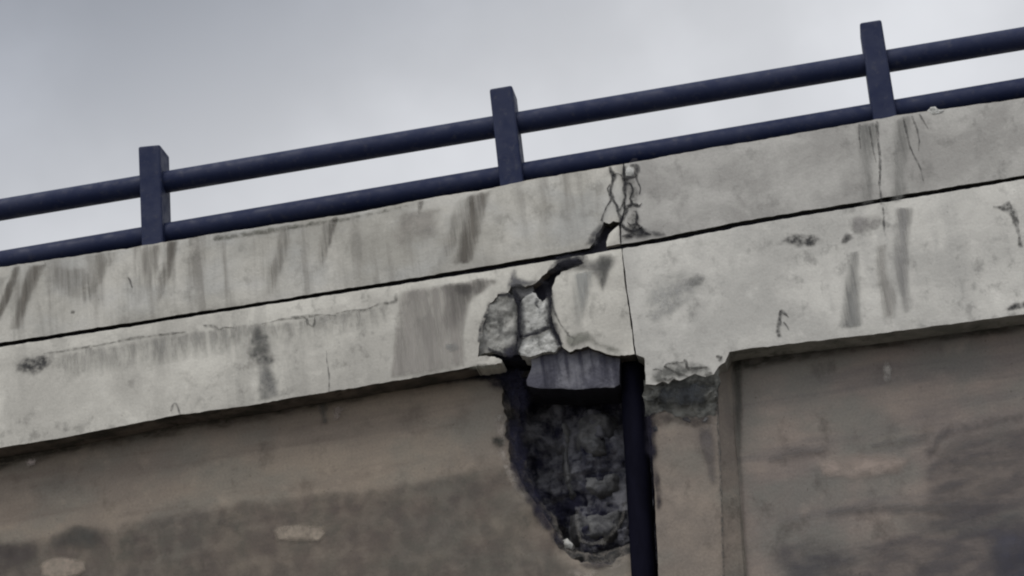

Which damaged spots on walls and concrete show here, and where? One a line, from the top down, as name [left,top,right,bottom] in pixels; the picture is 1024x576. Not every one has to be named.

water stain [0,266,40,320]
water stain [153,241,175,272]
water stain [252,329,274,396]
water stain [393,280,488,376]
water stain [460,193,485,263]
crack [597,158,651,249]
water stain [843,269,860,326]
water stain [843,219,873,242]
crack [859,122,885,227]
water stain [880,208,909,315]
spalling [476,255,630,576]